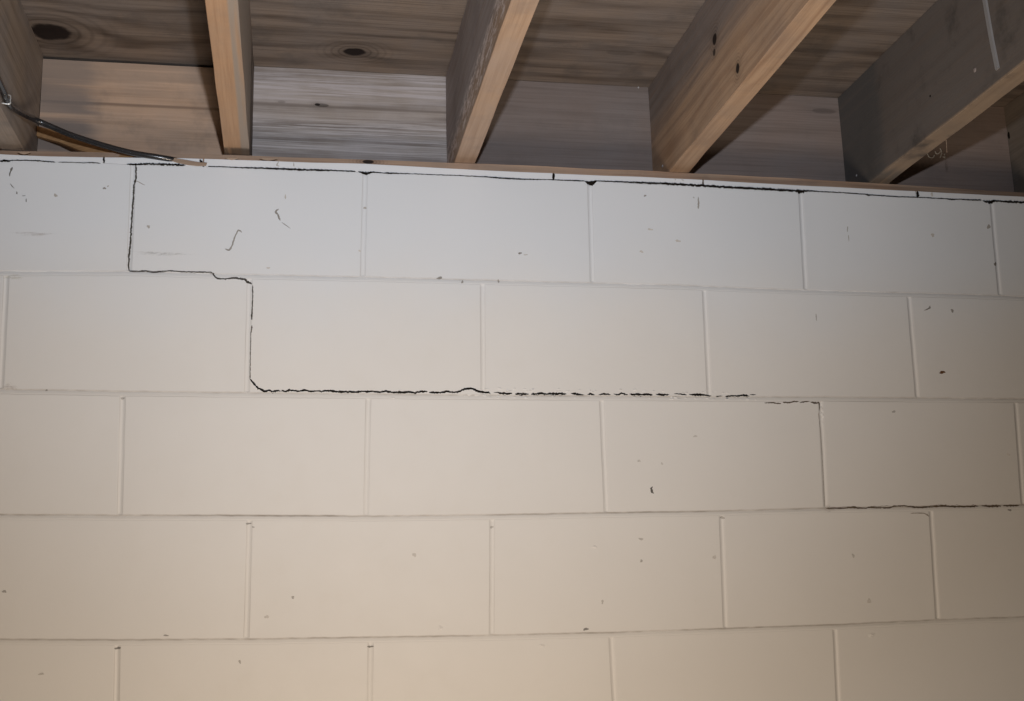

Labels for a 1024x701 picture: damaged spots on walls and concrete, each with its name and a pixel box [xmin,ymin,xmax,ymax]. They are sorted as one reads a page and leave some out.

crack [0,157,100,165]
crack [128,163,1024,516]